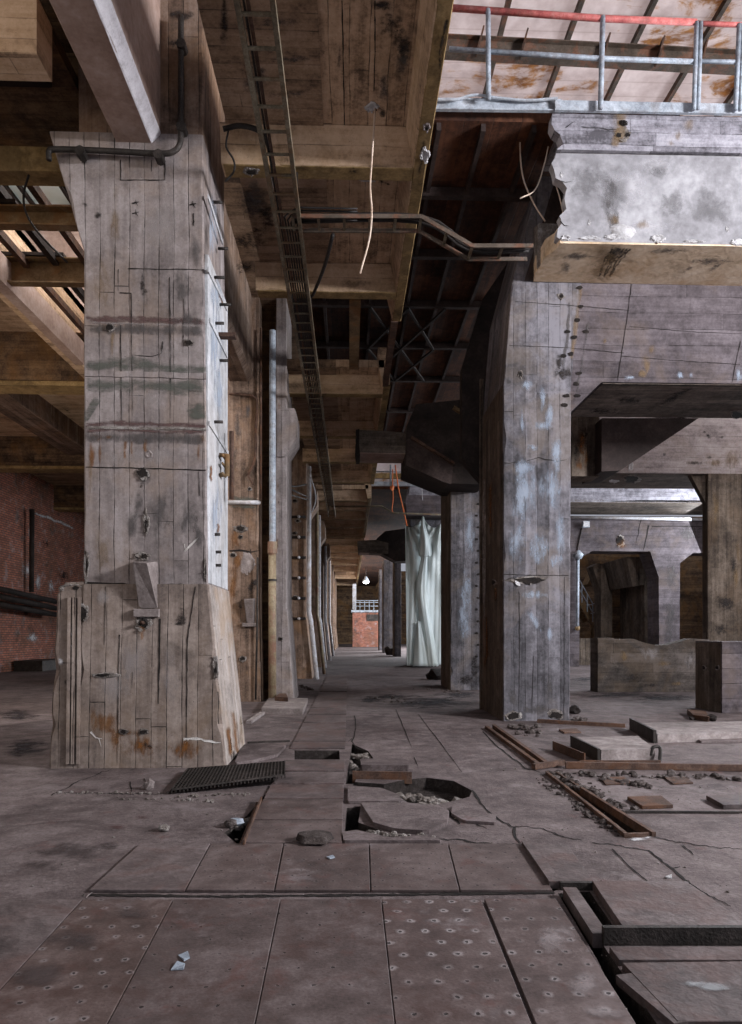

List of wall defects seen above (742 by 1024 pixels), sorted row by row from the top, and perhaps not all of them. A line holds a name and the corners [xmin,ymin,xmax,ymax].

damp [88,315,222,405]
spalling [502,576,549,586]
crack [396,710,739,906]